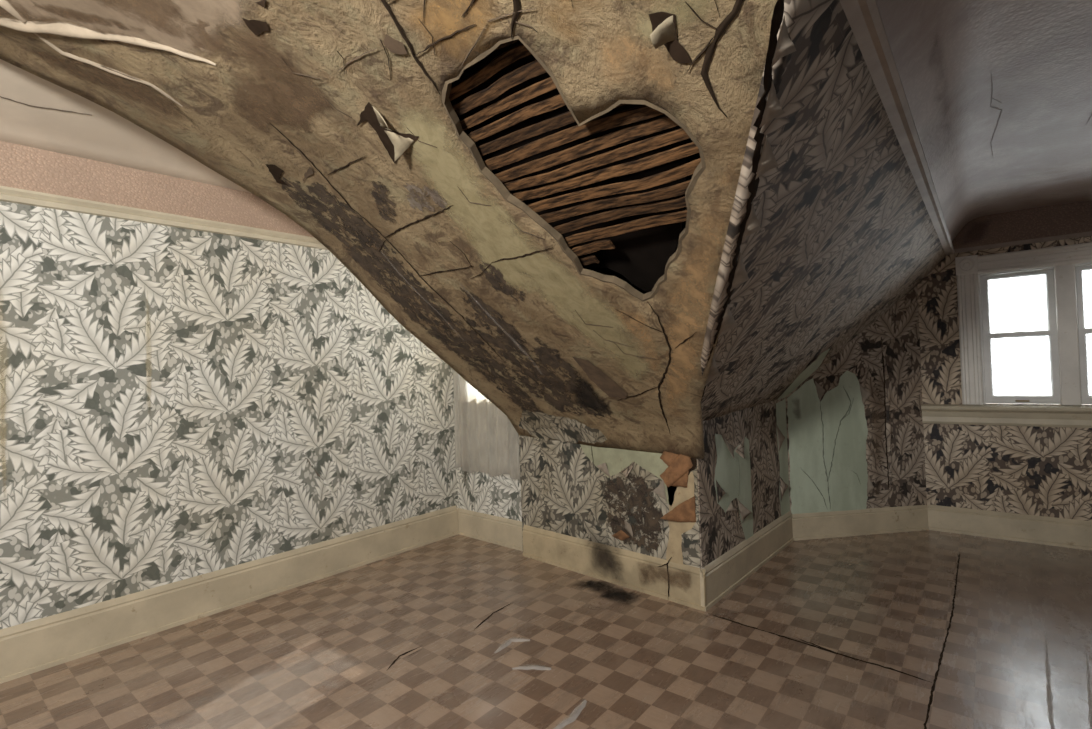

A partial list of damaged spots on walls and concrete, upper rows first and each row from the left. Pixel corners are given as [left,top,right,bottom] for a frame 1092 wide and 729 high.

crack [281,0,537,118]
flaking render [649,11,692,64]
crack [685,0,743,117]
flaking render [442,36,706,301]
crack [270,123,551,359]
crack [575,303,696,432]
water stain [582,543,634,604]
water stain [601,474,689,585]
flaking render [653,451,697,502]